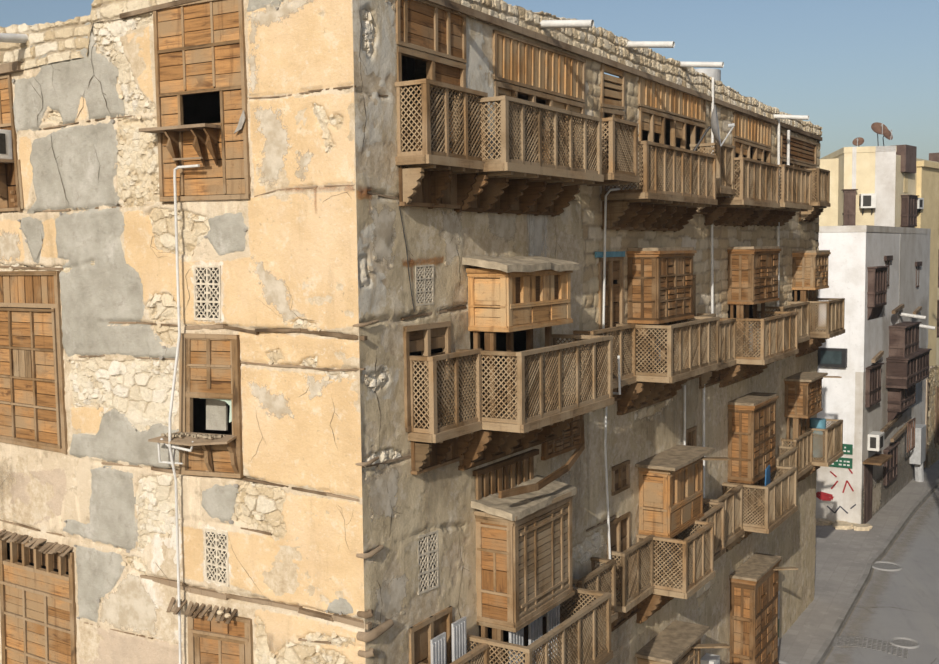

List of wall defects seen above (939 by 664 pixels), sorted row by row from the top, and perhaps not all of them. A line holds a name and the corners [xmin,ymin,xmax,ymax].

crack [76,27,110,120]
spalling [93,12,210,257]
spalling [67,293,182,431]
spalling [126,460,182,554]
spalling [228,481,287,541]
spalling [255,616,355,664]